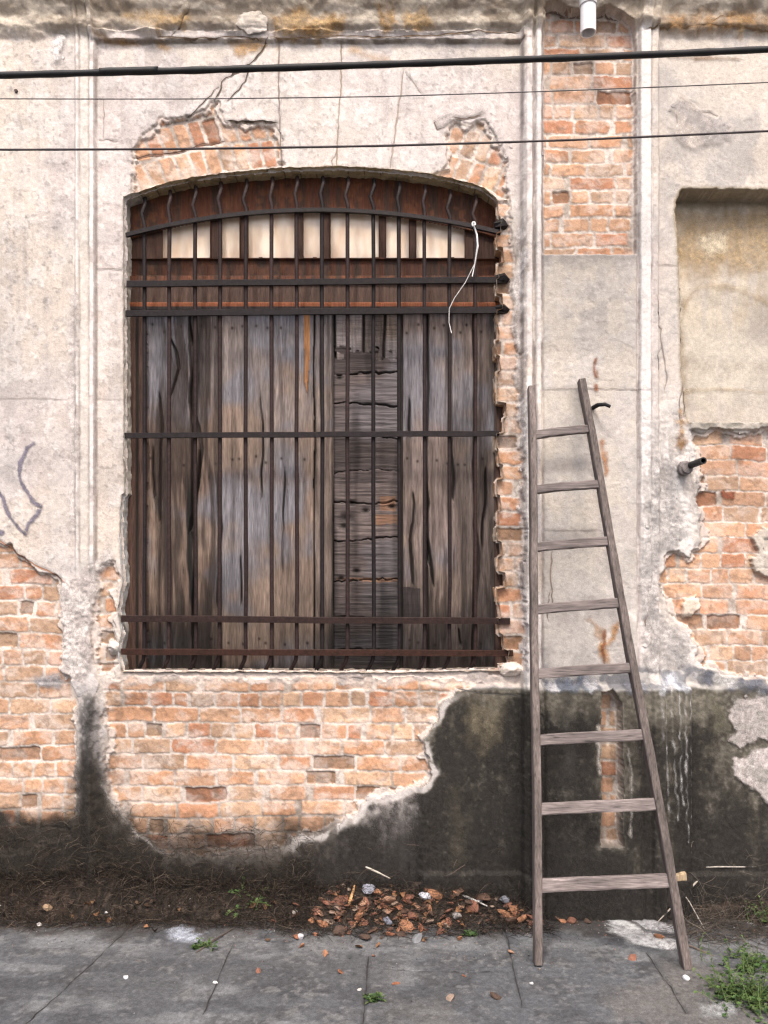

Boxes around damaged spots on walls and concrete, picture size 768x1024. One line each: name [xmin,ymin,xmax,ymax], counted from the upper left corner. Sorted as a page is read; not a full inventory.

spalling [132,102,285,199]
crack [99,6,519,169]
spalling [542,11,634,255]
spalling [430,108,530,676]
spalling [0,544,477,857]
damp [0,690,768,923]
rust [597,625,618,664]
spalling [598,691,618,841]
damp [662,671,694,692]
spalling [639,428,768,802]